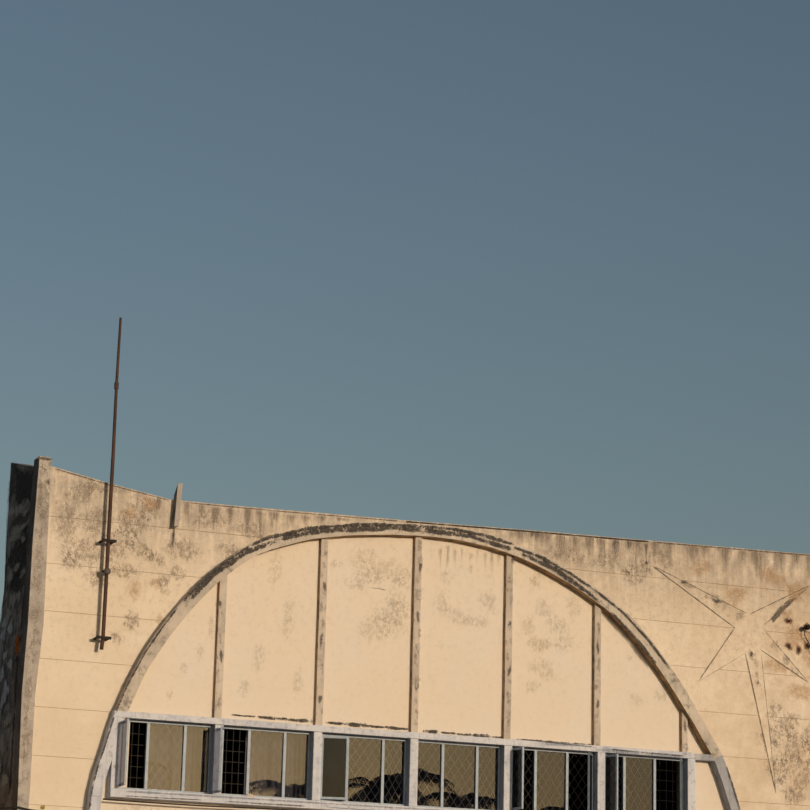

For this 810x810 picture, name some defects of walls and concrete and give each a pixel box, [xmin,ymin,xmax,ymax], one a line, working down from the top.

water stain [184,502,810,669]
peeling [0,592,21,787]
water stain [89,609,177,808]
water stain [232,714,313,723]
water stain [327,721,408,730]
water stain [423,730,502,738]